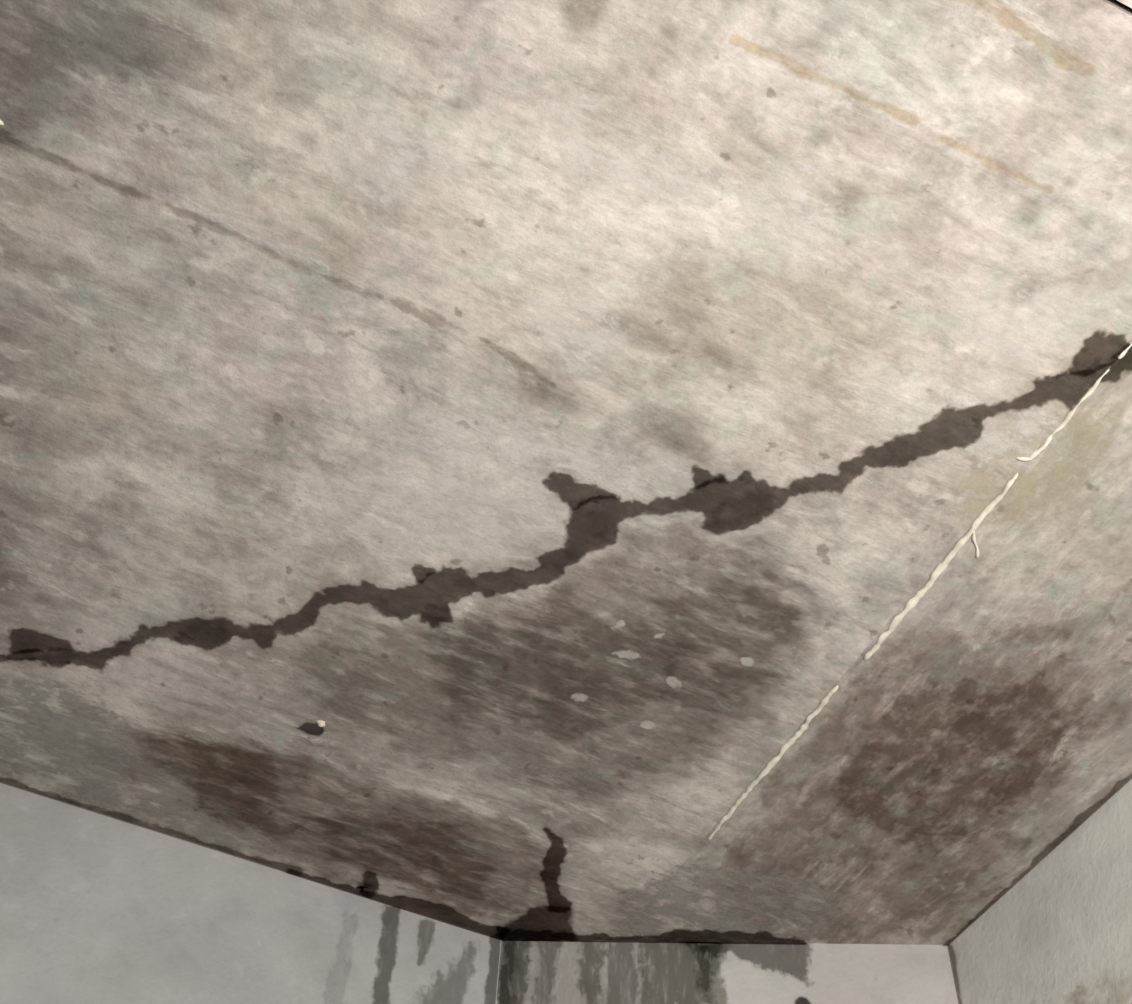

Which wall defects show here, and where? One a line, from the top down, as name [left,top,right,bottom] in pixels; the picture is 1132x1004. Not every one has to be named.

crack [0,332,1132,669]
crack [287,828,806,945]